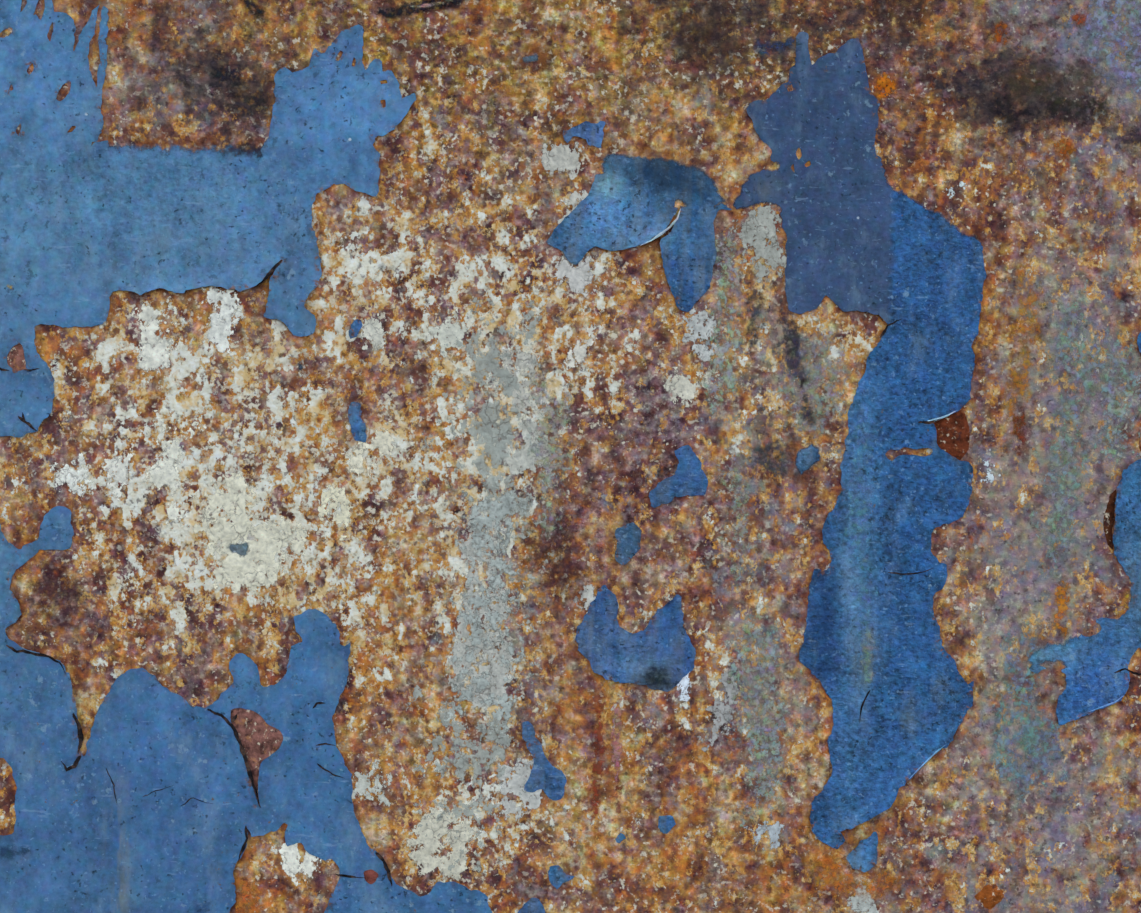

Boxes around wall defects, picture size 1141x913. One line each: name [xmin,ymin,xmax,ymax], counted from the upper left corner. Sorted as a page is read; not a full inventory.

peeling [0,0,416,442]
corrosion [7,344,26,371]
peeling [546,31,987,872]
corrosion [933,410,970,460]
corrosion [1103,490,1116,549]
peeling [1029,459,1141,725]
peeling [0,506,492,913]
corrosion [230,708,283,802]
peeling [522,721,567,801]
corrosion [364,869,378,884]
peeling [548,865,574,889]
corrosion [974,884,1004,909]